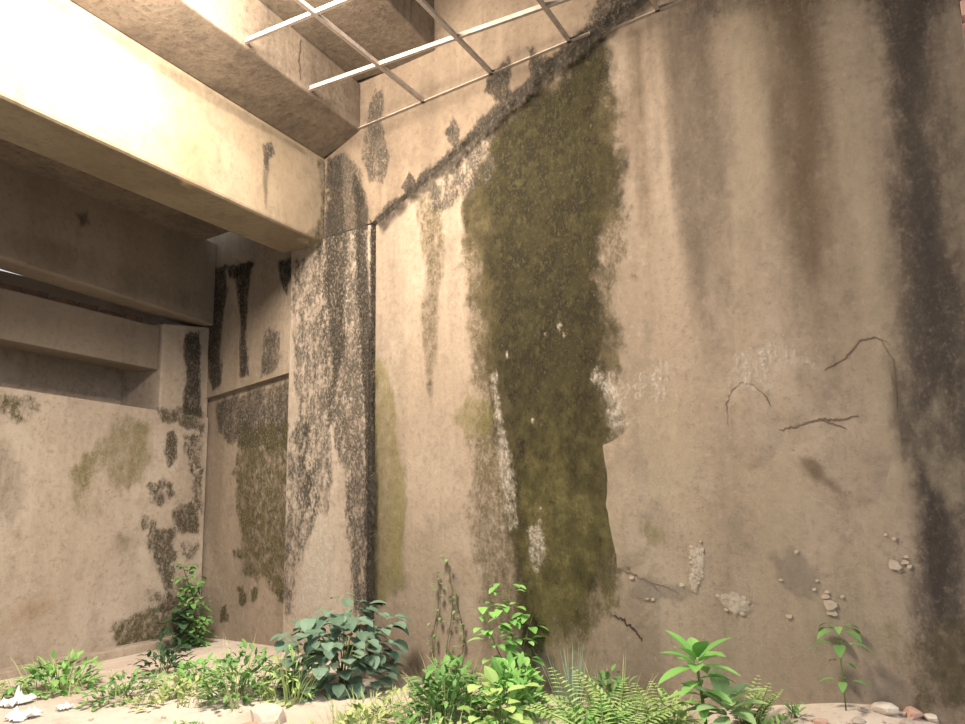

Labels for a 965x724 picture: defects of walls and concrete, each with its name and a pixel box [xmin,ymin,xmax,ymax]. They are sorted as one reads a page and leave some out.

mould [1,396,37,422]
damp [141,262,253,612]
damp [216,0,646,655]
crack [726,382,857,451]
crack [825,337,897,405]
damp [882,0,965,453]